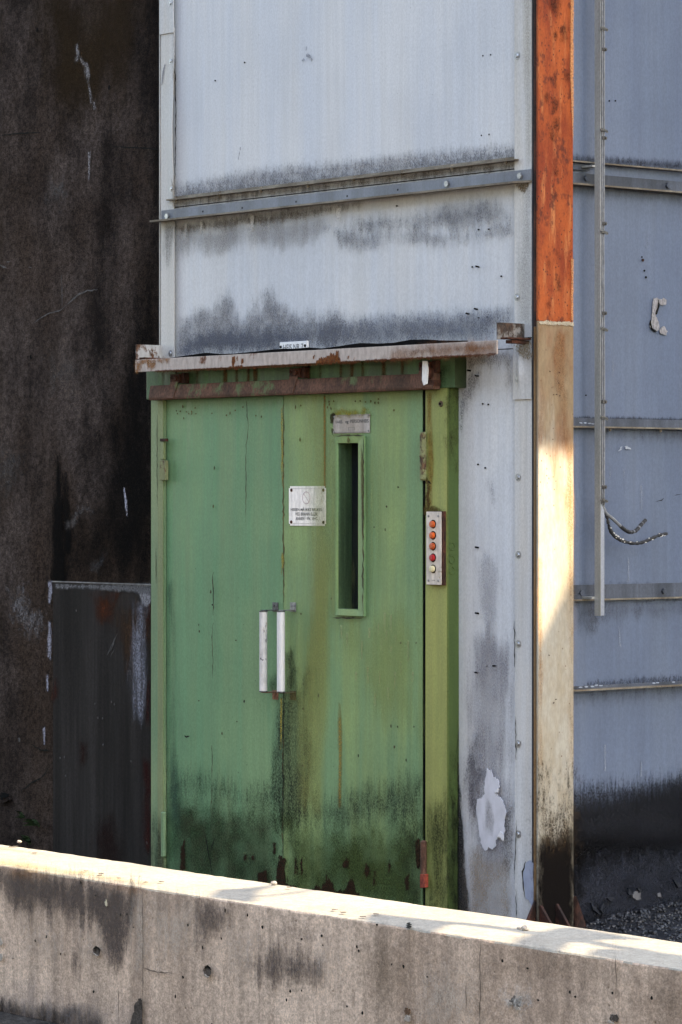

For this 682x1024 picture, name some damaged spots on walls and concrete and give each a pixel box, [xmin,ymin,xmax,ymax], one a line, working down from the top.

rust [554,0,574,130]
water stain [179,147,514,195]
water stain [338,200,507,246]
rust [135,342,533,384]
water stain [179,291,509,356]
rust [539,259,574,362]
water stain [475,630,508,711]
water stain [465,712,513,875]
peeling [476,768,507,851]
rust [258,842,303,888]
rust [312,857,391,896]
water stain [7,872,145,969]